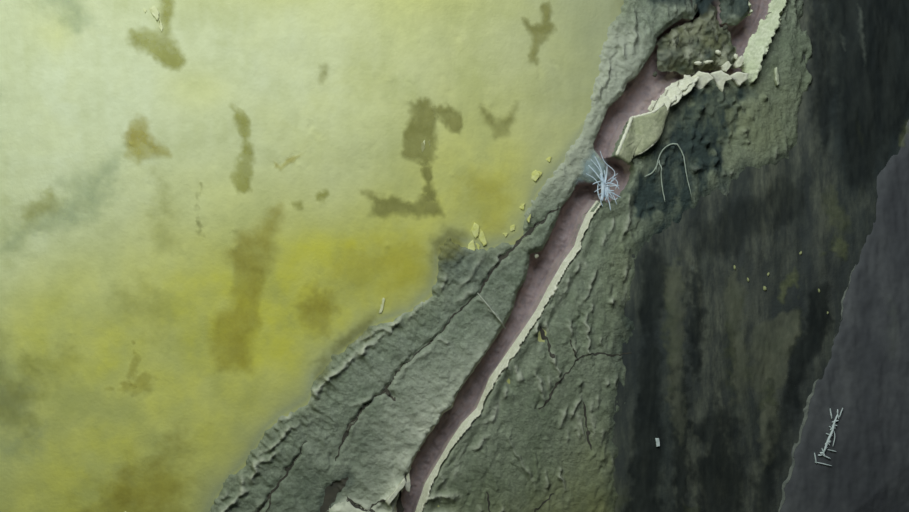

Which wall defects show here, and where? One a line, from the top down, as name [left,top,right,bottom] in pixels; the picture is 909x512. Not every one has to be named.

leakage [133,33,183,68]
leakage [526,4,552,59]
spalling [615,0,787,164]
leakage [234,172,249,192]
leakage [236,113,252,155]
leakage [374,100,462,215]
crack [320,0,771,512]
spalling [415,200,601,512]
crack [256,441,307,512]
spalling [329,502,355,512]
peeling [385,473,411,506]